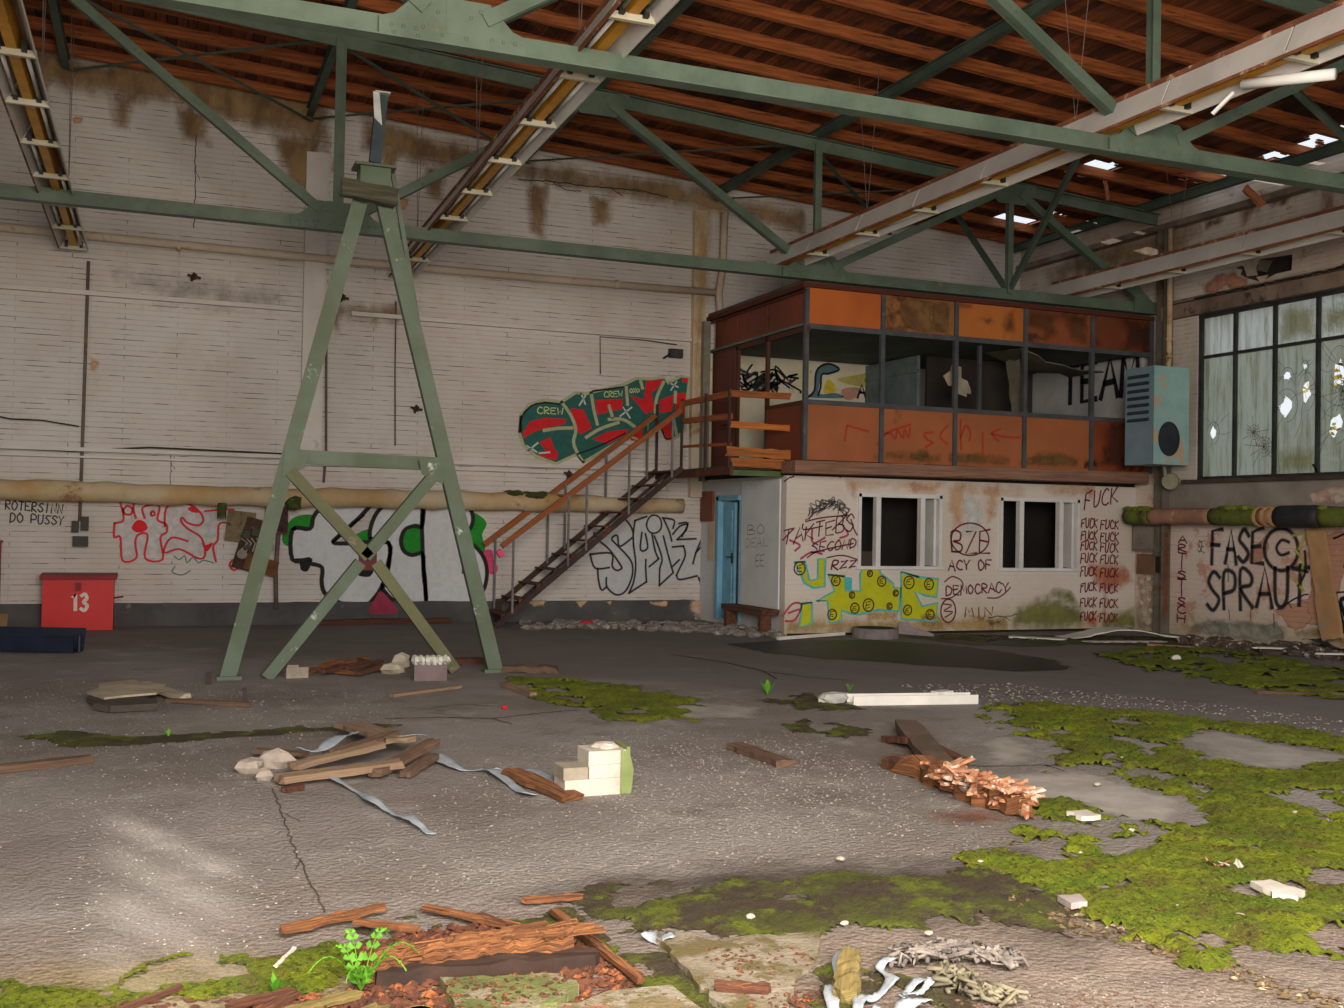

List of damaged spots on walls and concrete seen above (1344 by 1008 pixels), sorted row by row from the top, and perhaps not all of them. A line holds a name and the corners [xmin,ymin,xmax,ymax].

damp [36,49,325,188]
damp [366,122,471,197]
damp [516,165,804,257]
crack [272,788,325,913]